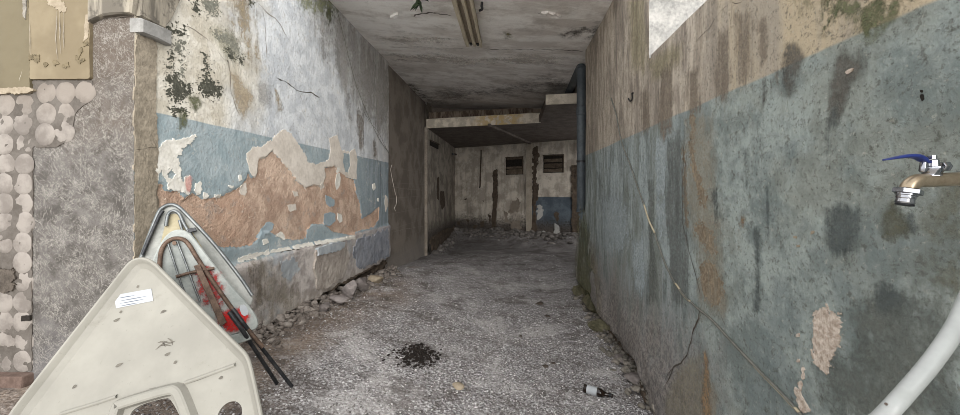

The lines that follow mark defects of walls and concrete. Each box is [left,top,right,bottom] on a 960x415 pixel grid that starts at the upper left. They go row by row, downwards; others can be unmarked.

leakage [821,0,899,36]
leakage [161,0,279,129]
leakage [783,44,803,91]
leakage [826,53,861,140]
flaking render [132,35,388,259]
leakage [826,206,860,256]
crack [665,307,701,386]
flaking render [794,303,843,413]